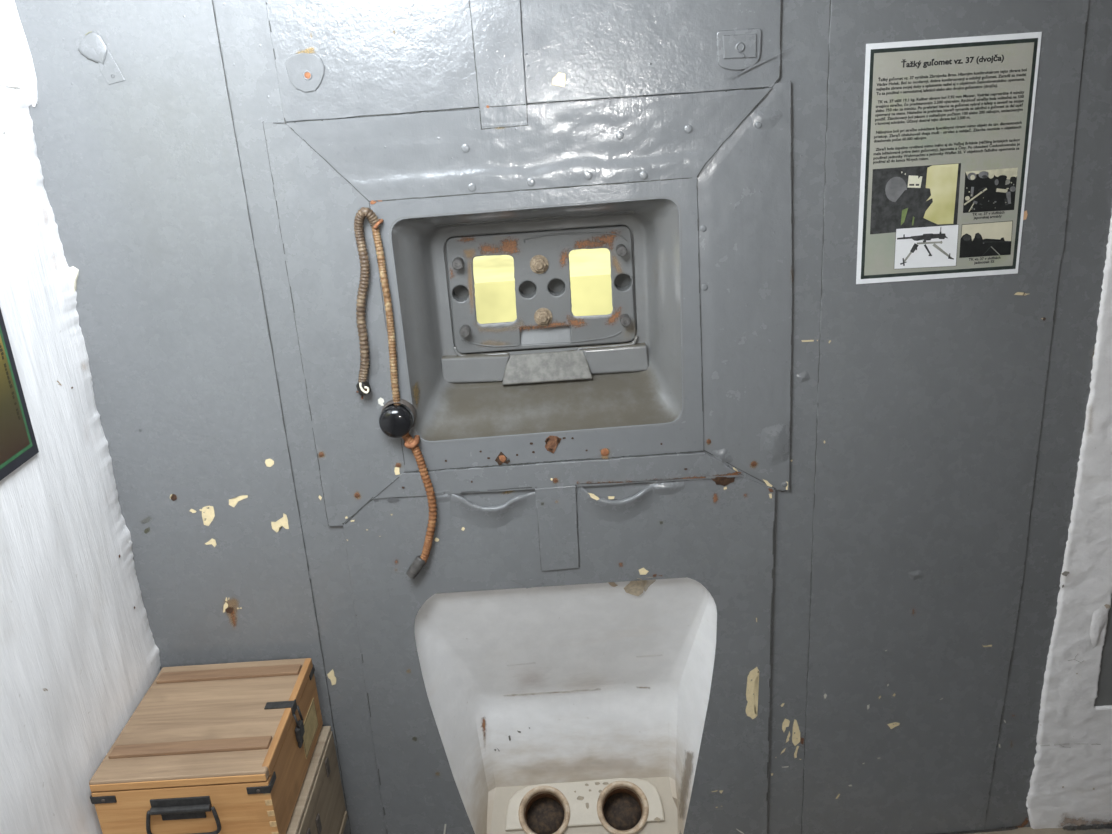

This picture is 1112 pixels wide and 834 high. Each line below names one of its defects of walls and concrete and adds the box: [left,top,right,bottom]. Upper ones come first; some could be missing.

rust [460,237,519,254]
rust [560,232,617,267]
rust [520,315,585,331]
rust [545,436,561,453]
peeling [229,495,248,507]
peeling [190,506,217,547]
peeling [271,513,289,532]
spalling [609,568,662,596]
peeling [746,667,759,719]
peeling [771,703,804,776]